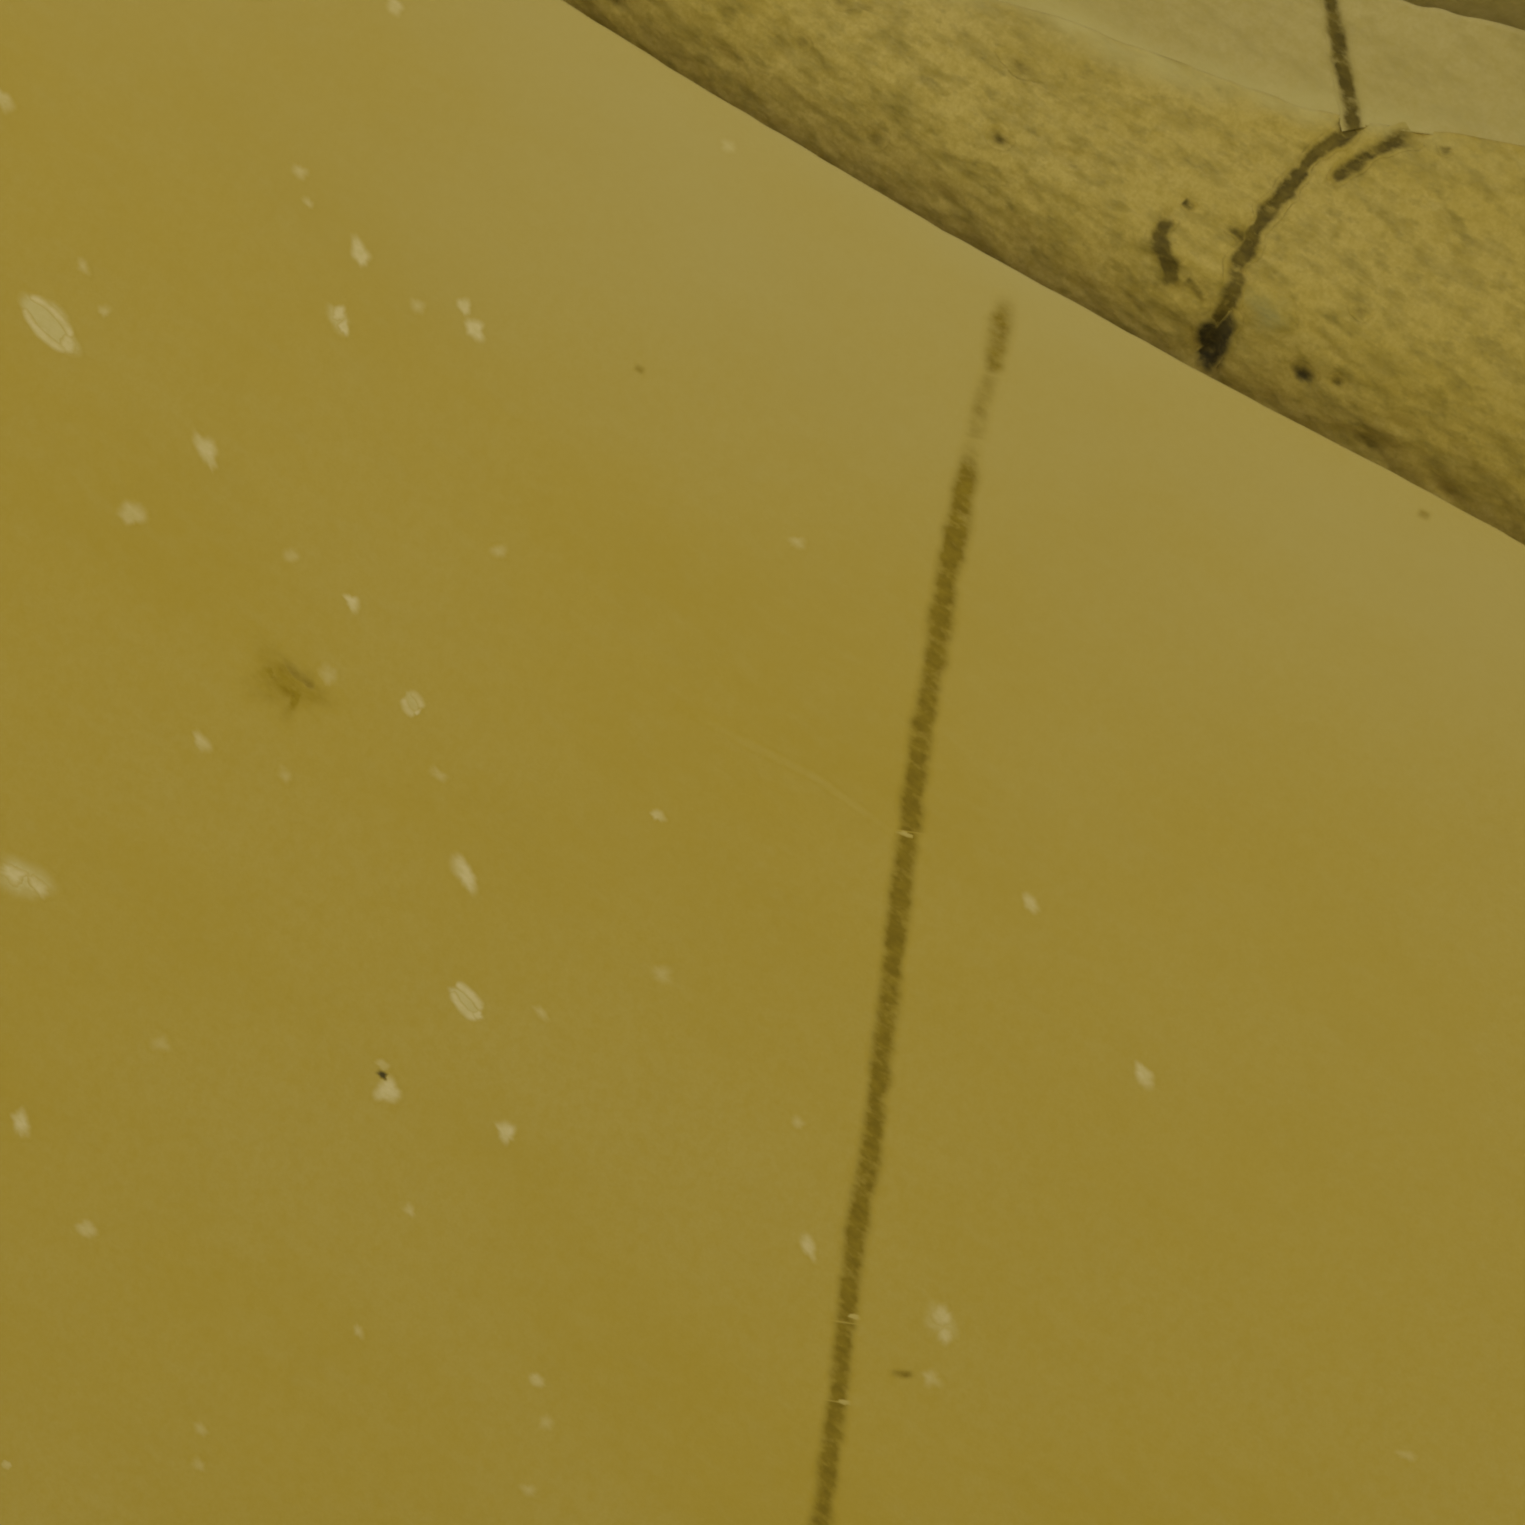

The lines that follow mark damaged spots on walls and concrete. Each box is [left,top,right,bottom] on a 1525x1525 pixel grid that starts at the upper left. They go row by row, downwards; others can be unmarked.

crack [1145,0,1454,377]
peeling [348,229,375,271]
peeling [15,289,85,359]
peeling [322,297,353,340]
peeling [454,295,488,346]
peeling [0,848,65,907]
peeling [446,848,481,901]
crack [801,287,1020,1525]
peeling [446,979,486,1023]
peeling [369,1056,405,1107]